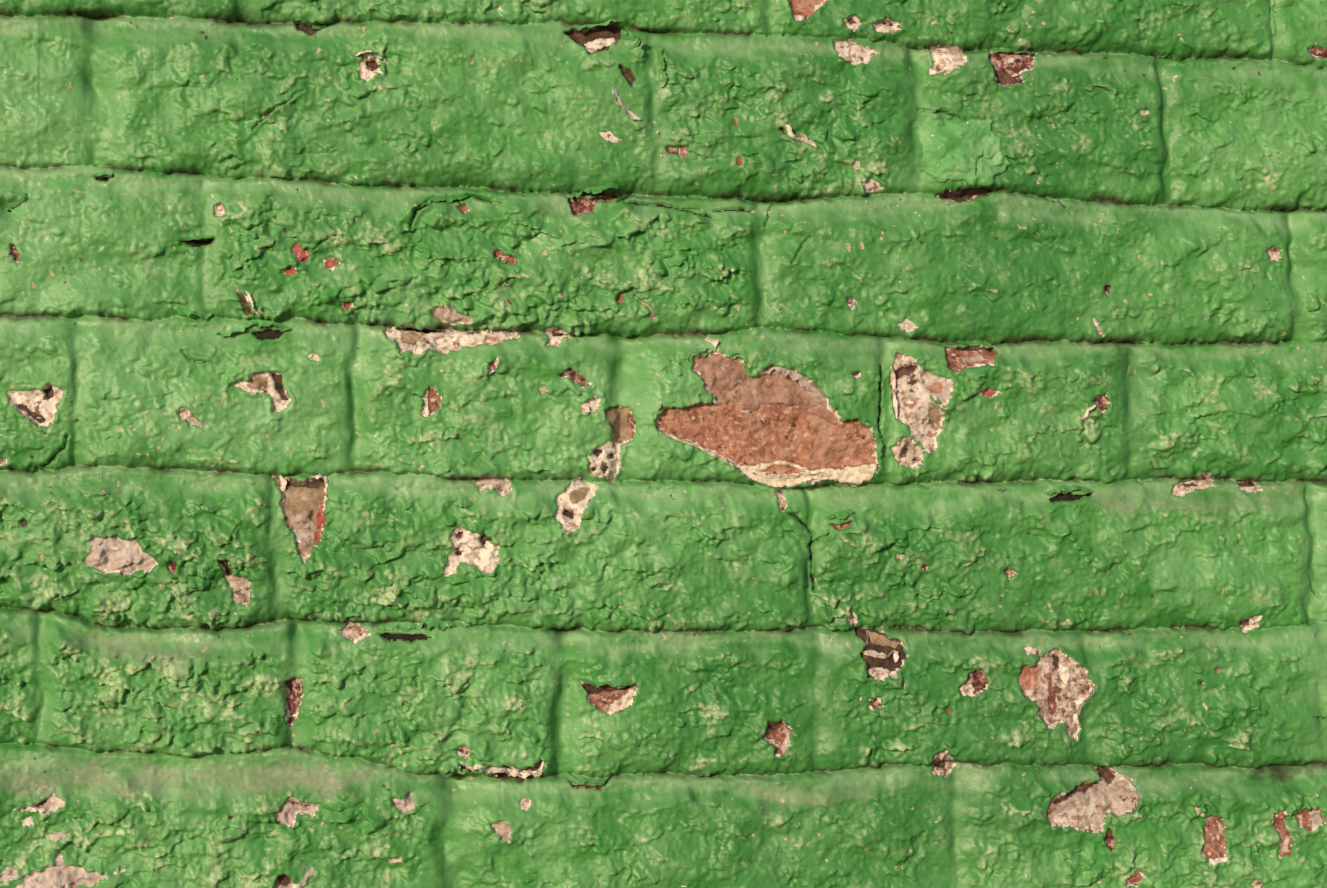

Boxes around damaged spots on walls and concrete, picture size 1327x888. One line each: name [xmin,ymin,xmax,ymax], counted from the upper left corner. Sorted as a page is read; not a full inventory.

peeling [834,15,902,65]
peeling [383,304,520,374]
peeling [7,384,64,428]
peeling [555,368,636,534]
peeling [655,337,998,512]
peeling [84,536,177,576]
peeling [271,473,329,565]
peeling [443,526,501,577]
peeling [847,610,908,711]
peeling [1018,644,1095,743]
peeling [1047,766,1141,852]
peeling [0,832,127,888]